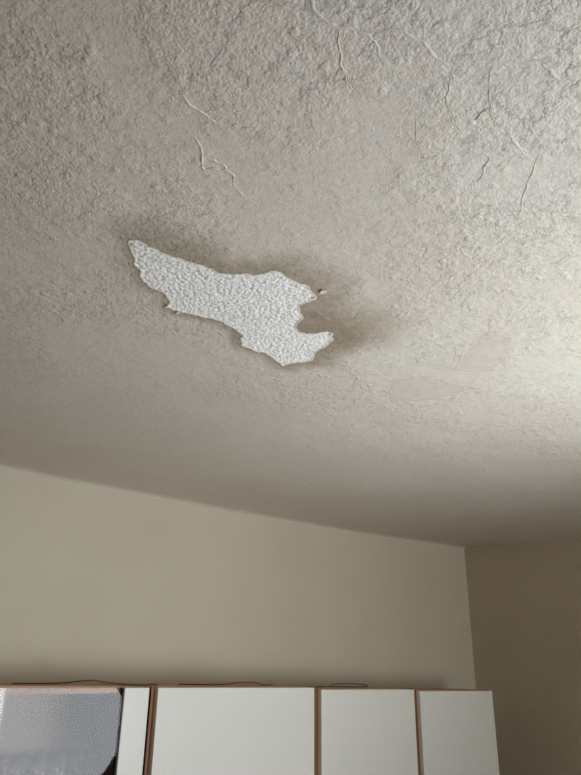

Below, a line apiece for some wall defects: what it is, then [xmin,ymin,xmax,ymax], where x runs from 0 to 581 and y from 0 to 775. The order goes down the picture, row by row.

crack [337,29,362,101]
crack [445,66,497,136]
crack [518,146,541,220]
water stain [168,253,263,274]
peeling [127,240,334,366]
water stain [277,268,323,334]
water stain [235,319,365,367]